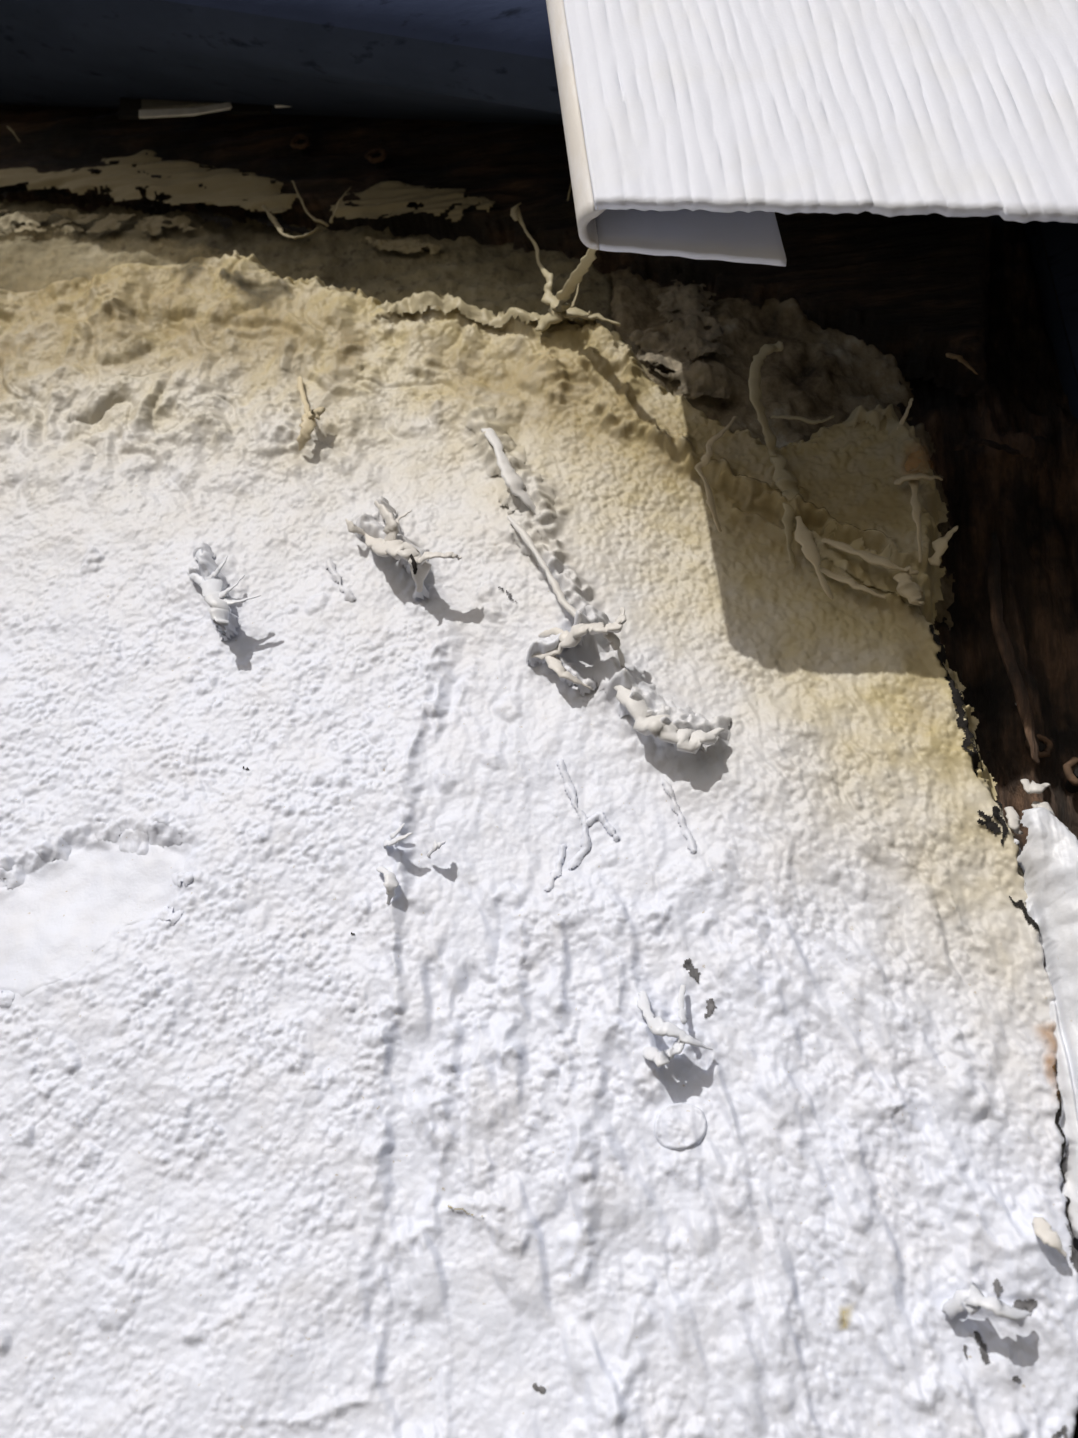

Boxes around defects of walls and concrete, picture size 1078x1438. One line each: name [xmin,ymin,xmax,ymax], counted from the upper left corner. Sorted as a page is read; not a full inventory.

leakage [220,269,283,321]
spalling [0,150,955,641]
peeling [526,605,627,696]